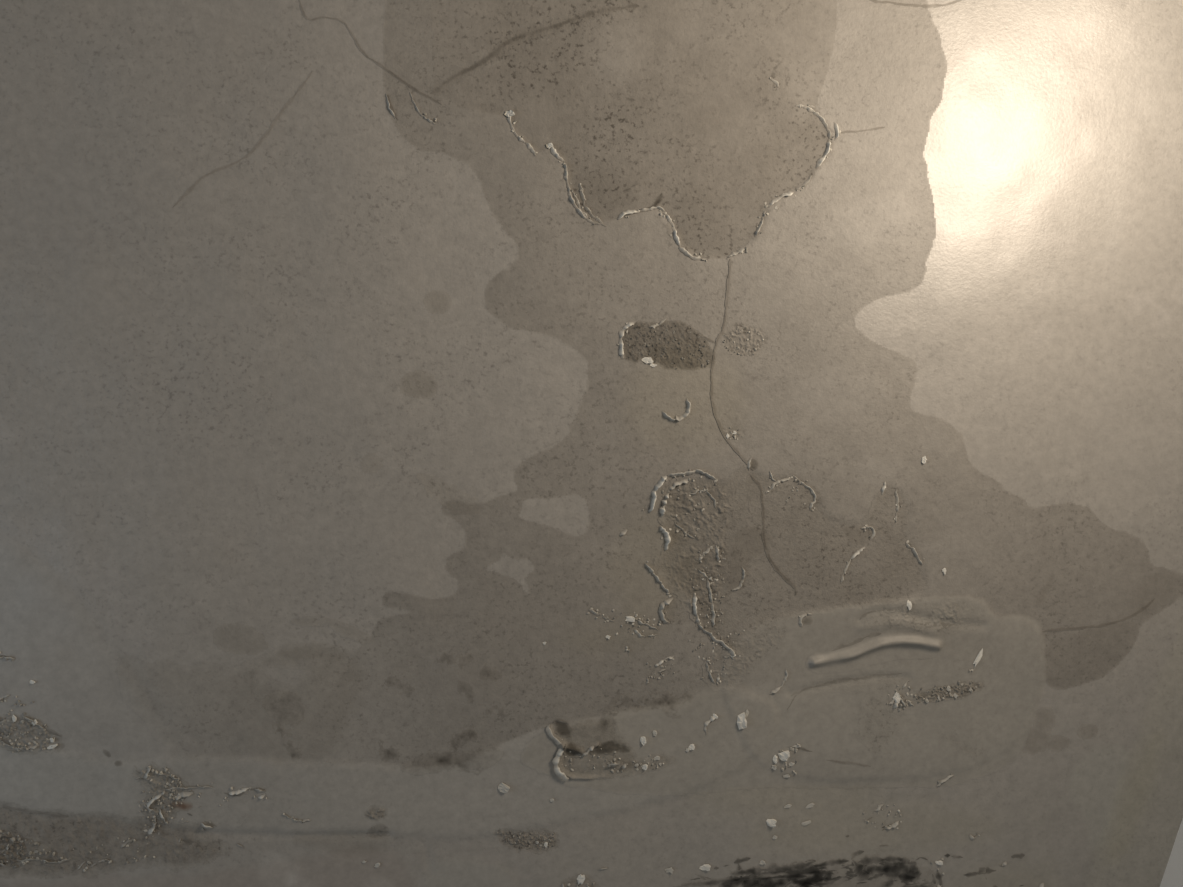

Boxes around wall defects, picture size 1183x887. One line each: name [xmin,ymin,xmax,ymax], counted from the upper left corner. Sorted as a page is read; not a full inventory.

crack [299,0,639,125]
crack [871,0,962,8]
peeling [431,0,841,262]
leakage [115,0,1183,776]
flaking render [617,318,766,371]
crack [705,258,797,595]
peeling [586,465,930,692]
peeling [0,694,65,757]
flaking render [544,715,695,782]
flaking render [887,648,985,716]
flaking render [0,749,267,879]